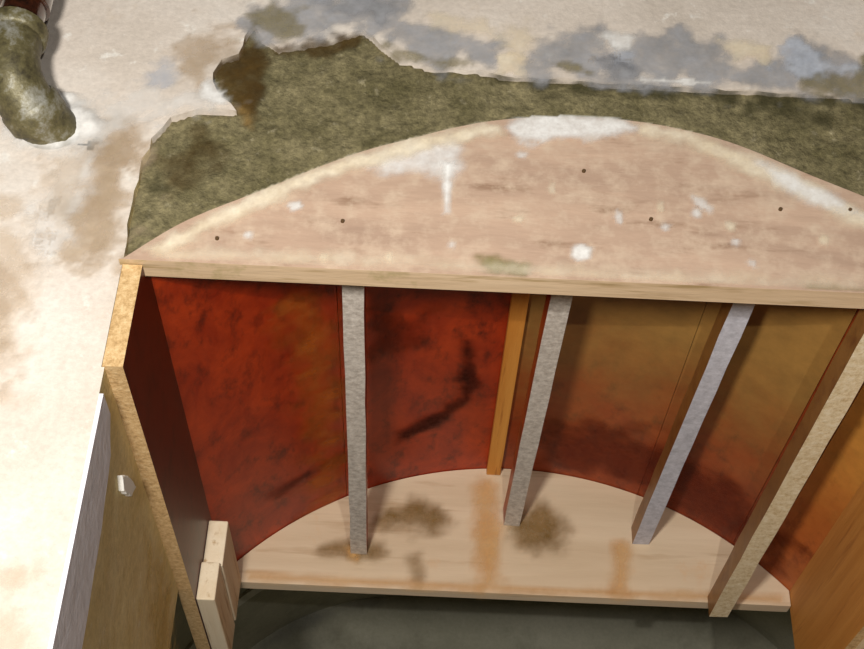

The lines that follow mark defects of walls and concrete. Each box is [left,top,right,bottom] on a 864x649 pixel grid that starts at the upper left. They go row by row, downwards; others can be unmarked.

peeling [603,33,633,49]
damp [185,0,504,125]
damp [526,25,864,106]
peeling [200,82,226,104]
peeling [641,78,705,86]